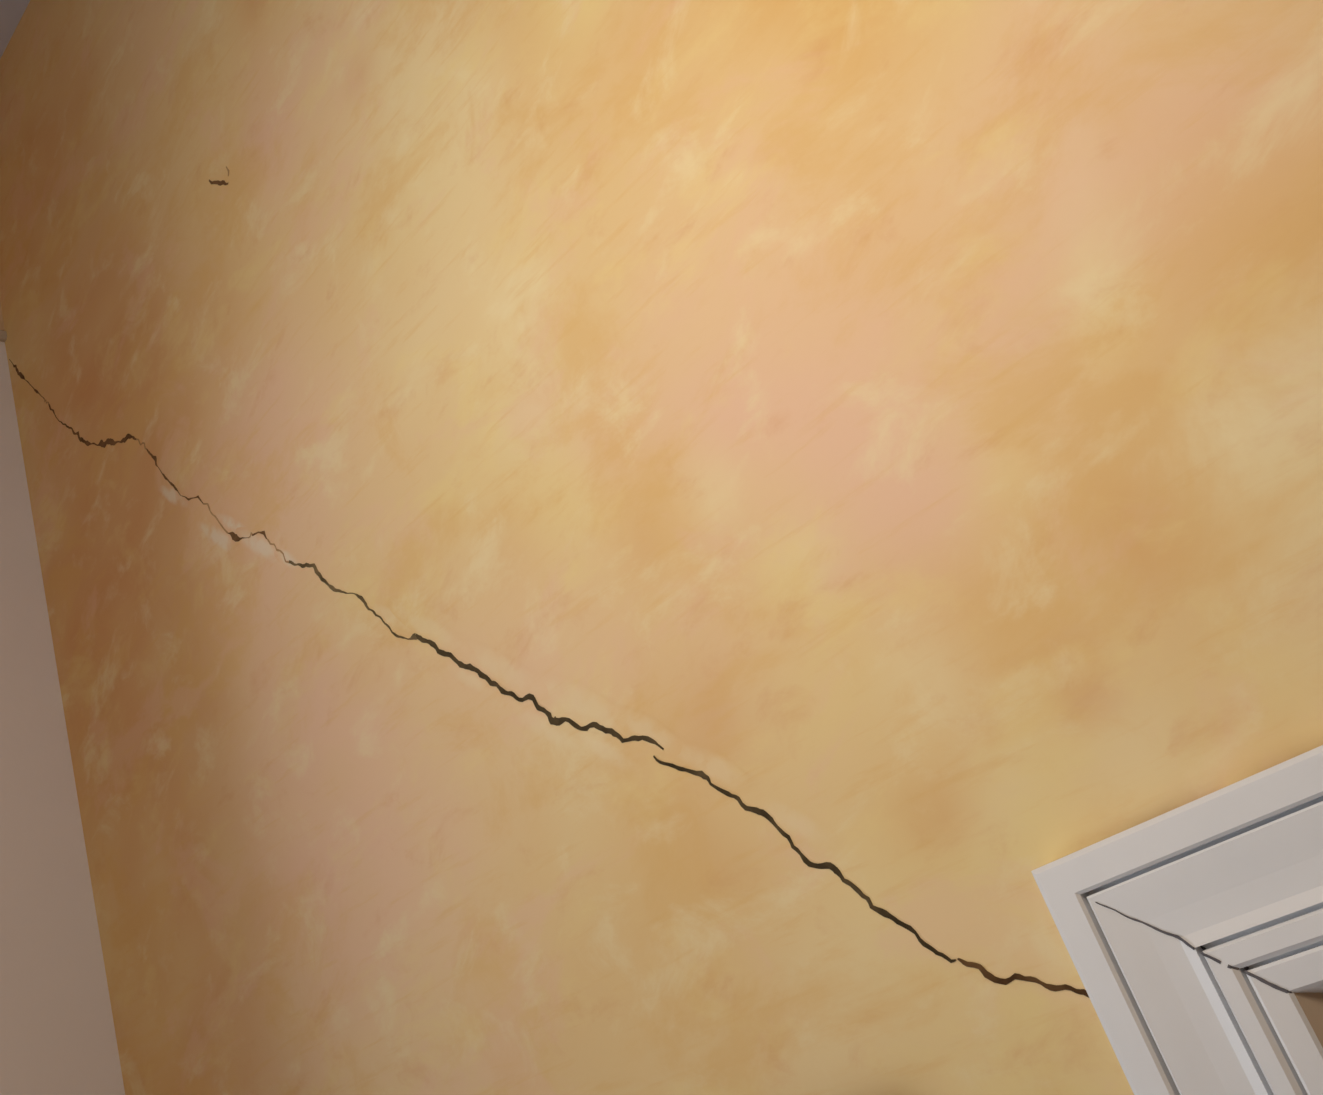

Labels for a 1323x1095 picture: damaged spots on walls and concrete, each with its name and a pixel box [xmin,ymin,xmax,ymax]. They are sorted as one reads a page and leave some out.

crack [9,359,1089,998]